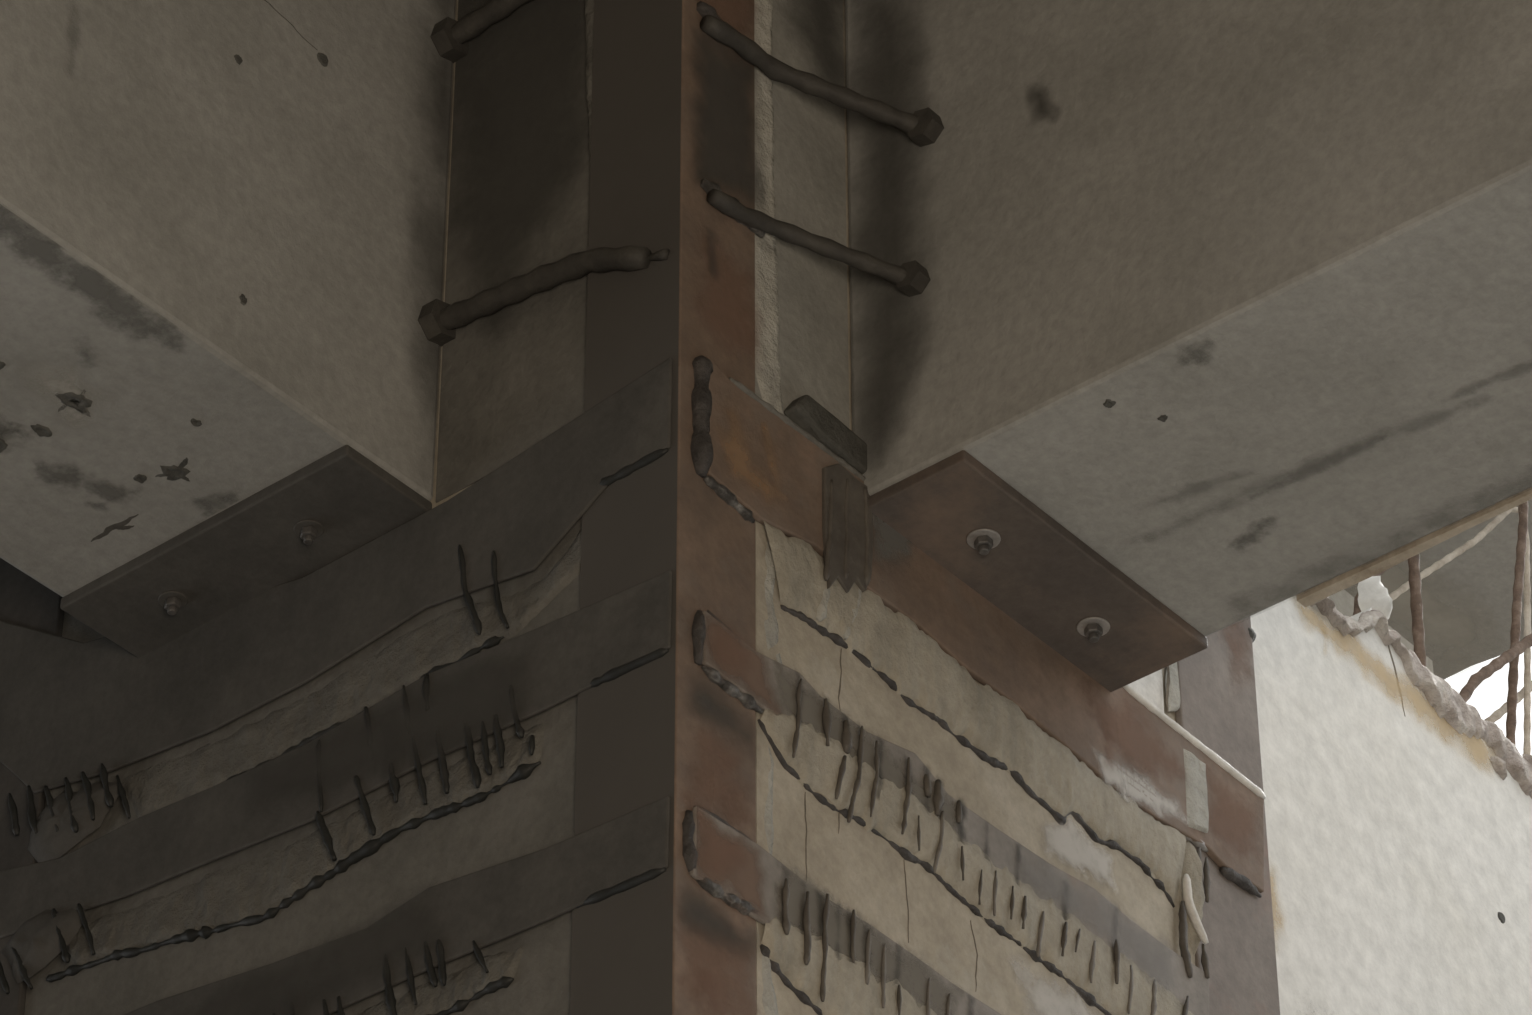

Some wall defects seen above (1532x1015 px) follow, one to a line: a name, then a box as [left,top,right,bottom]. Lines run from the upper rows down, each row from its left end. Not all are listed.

leakage [0,206,178,347]
spalling [1295,501,1532,799]